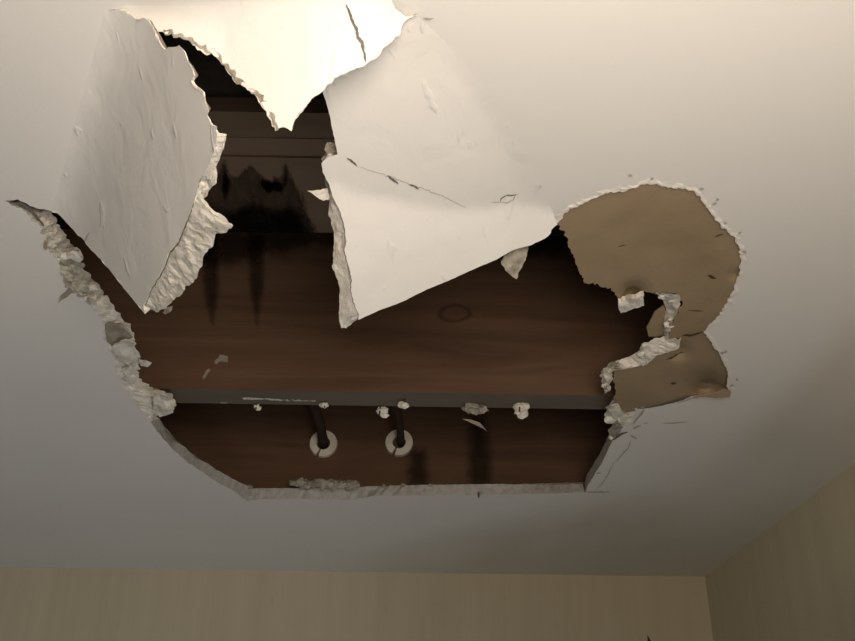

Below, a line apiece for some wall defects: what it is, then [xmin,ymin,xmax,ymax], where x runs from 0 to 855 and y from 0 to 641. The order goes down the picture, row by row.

spalling [254,35,398,131]
water stain [52,212,72,229]
spalling [110,9,227,314]
water stain [203,161,334,310]
peeling [309,178,336,203]
peeling [321,142,337,162]
crack [347,158,464,207]
water stain [527,224,567,255]
spalling [9,200,176,422]
peeling [554,174,749,441]
crack [589,398,695,493]